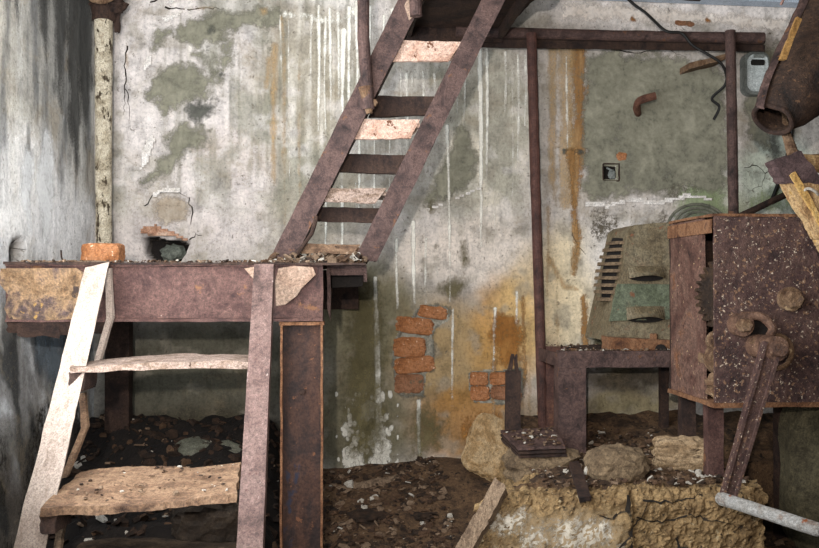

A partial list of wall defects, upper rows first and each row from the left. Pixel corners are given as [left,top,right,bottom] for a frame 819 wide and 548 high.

leakage [38,0,93,168]
leakage [279,1,359,129]
leakage [21,134,54,237]
peeling [153,186,180,197]
rust [549,49,589,275]
leakage [344,287,388,459]
flaking render [392,303,451,398]
leakage [410,400,441,456]
flaking render [469,368,526,405]
rust [488,292,527,382]
rust [580,294,588,345]
crack [599,493,748,548]